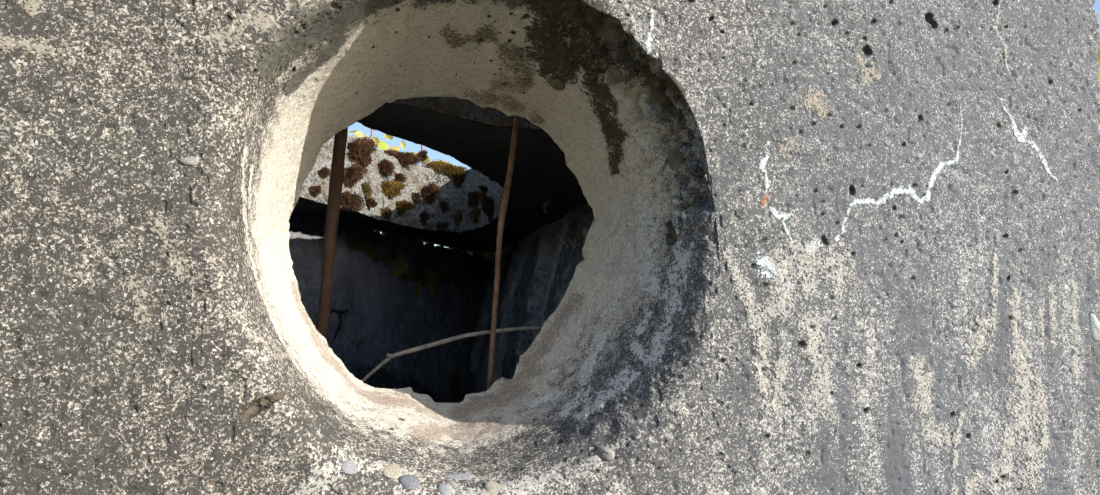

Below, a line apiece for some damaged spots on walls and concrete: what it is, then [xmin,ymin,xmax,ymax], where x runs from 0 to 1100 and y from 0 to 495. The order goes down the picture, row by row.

water stain [438,15,544,86]
water stain [645,9,654,54]
crack [759,141,793,244]
crack [834,106,963,241]
crack [1003,106,1058,181]
water stain [720,235,863,425]
water stain [908,248,1059,495]
water stain [1069,279,1079,380]